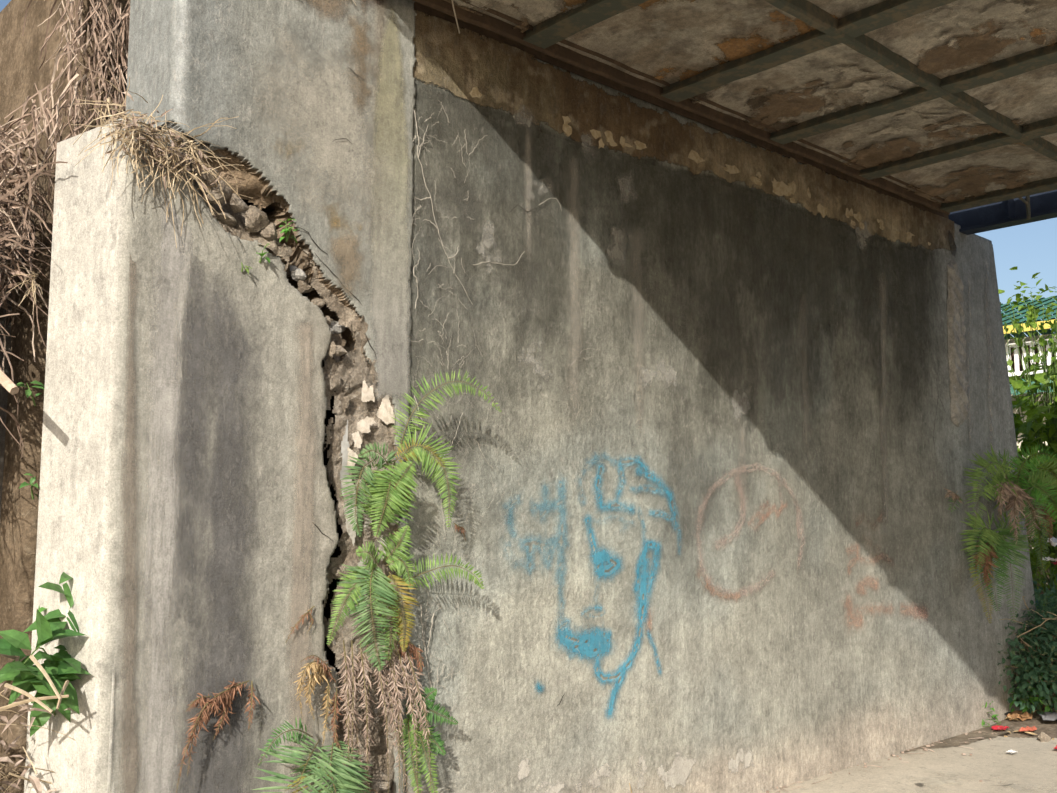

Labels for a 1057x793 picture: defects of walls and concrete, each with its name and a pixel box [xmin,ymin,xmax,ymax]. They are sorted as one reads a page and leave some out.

leakage [419,85,929,408]
flaking render [413,9,957,251]
rust [655,11,816,81]
rust [747,79,851,130]
leakage [870,106,970,137]
rust [839,115,1003,170]
rust [917,18,1056,74]
leakage [141,195,252,793]
crack [169,127,377,677]
leakage [290,323,314,793]